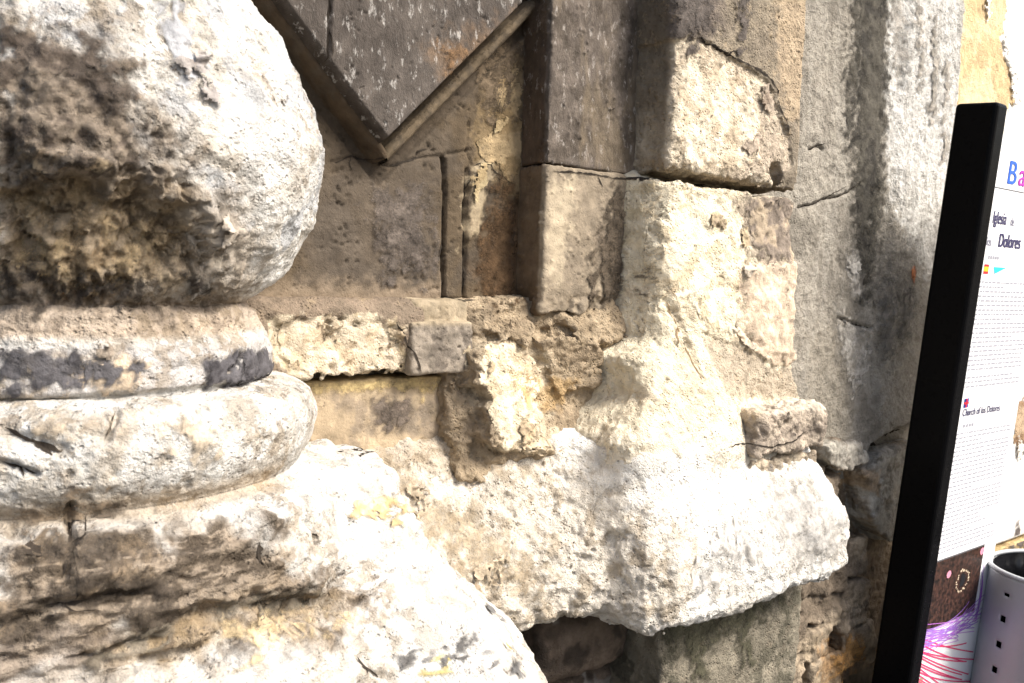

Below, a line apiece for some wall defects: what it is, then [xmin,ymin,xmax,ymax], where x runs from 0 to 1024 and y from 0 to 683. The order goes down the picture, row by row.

spalling [153,0,225,105]
crack [800,183,859,207]
spalling [21,204,250,293]
damp [0,347,146,399]
damp [203,347,274,391]
spalling [430,295,628,485]
crack [2,427,62,476]
crack [731,430,808,460]